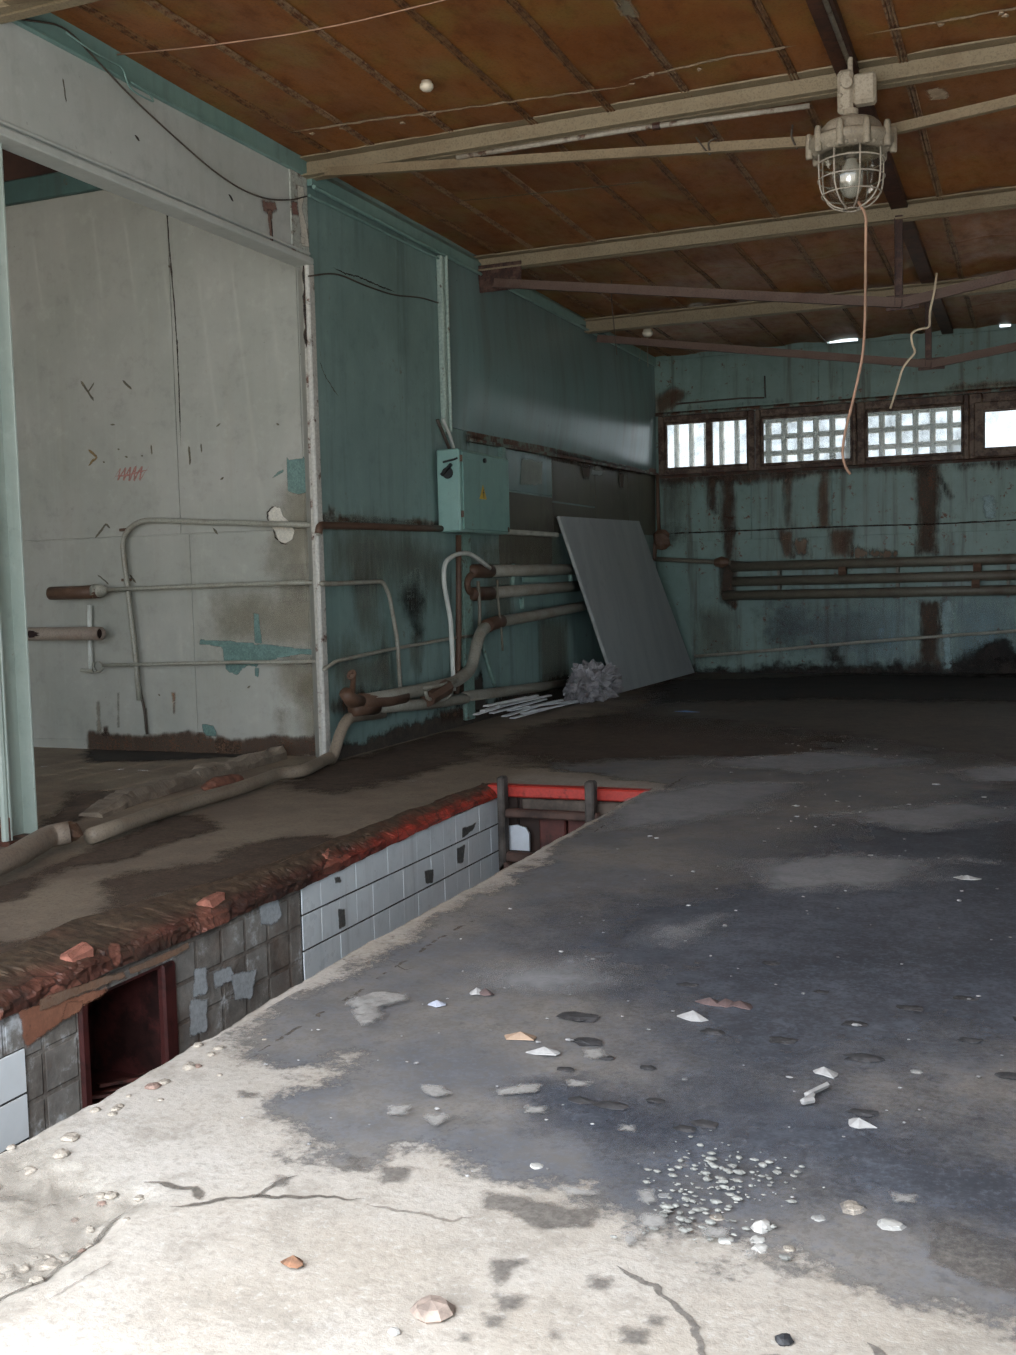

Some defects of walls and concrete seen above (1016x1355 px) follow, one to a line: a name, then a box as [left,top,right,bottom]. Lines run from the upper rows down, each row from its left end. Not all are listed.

rust [662,464,951,609]
peeling [200,613,312,677]
rust [920,601,941,666]
leakage [747,855,934,889]
spalling [0,798,499,1159]
crack [150,1176,360,1207]
leakage [381,1167,409,1181]
leakage [484,1193,598,1228]
leakage [524,1085,1016,1292]
spalling [0,1217,95,1288]
crack [0,1212,125,1301]
crack [616,1265,705,1355]